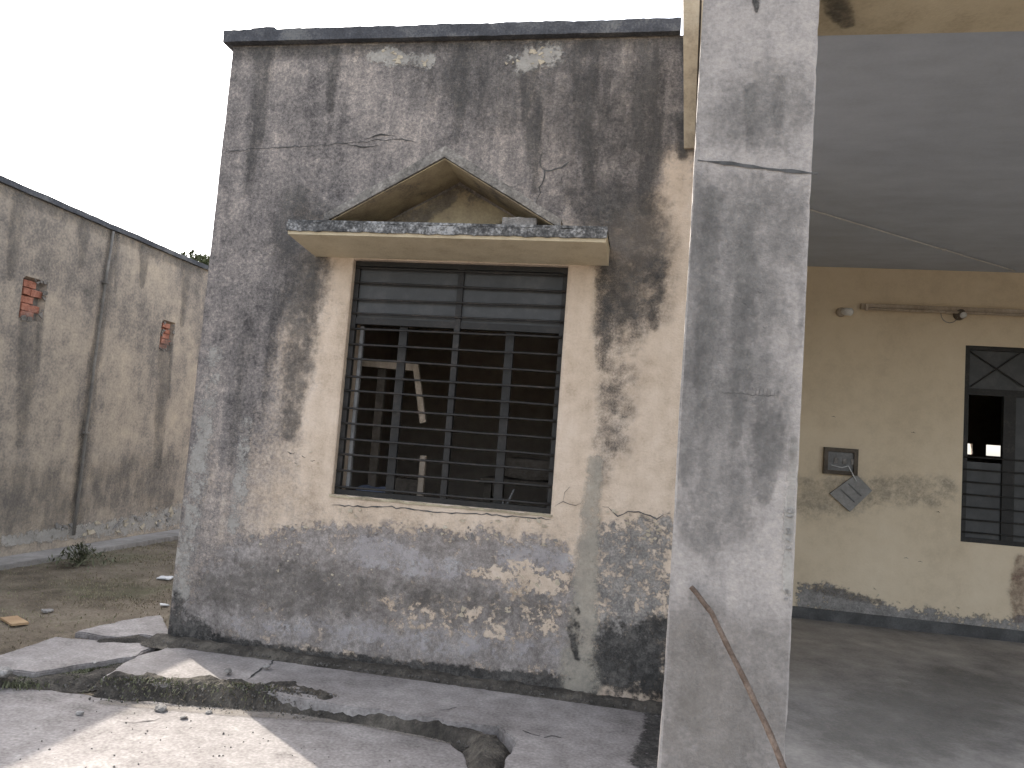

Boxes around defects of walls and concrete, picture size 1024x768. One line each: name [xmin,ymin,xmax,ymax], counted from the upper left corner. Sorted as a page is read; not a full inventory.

flaking render [366,47,435,69]
flaking render [505,43,563,73]
crack [226,133,416,152]
crack [536,154,572,202]
crack [698,160,818,174]
damp [566,184,668,351]
spalling [19,279,48,322]
damp [275,190,327,438]
spalling [159,322,175,352]
crack [608,507,671,525]
peeling [782,437,1024,631]
peeling [181,505,673,682]